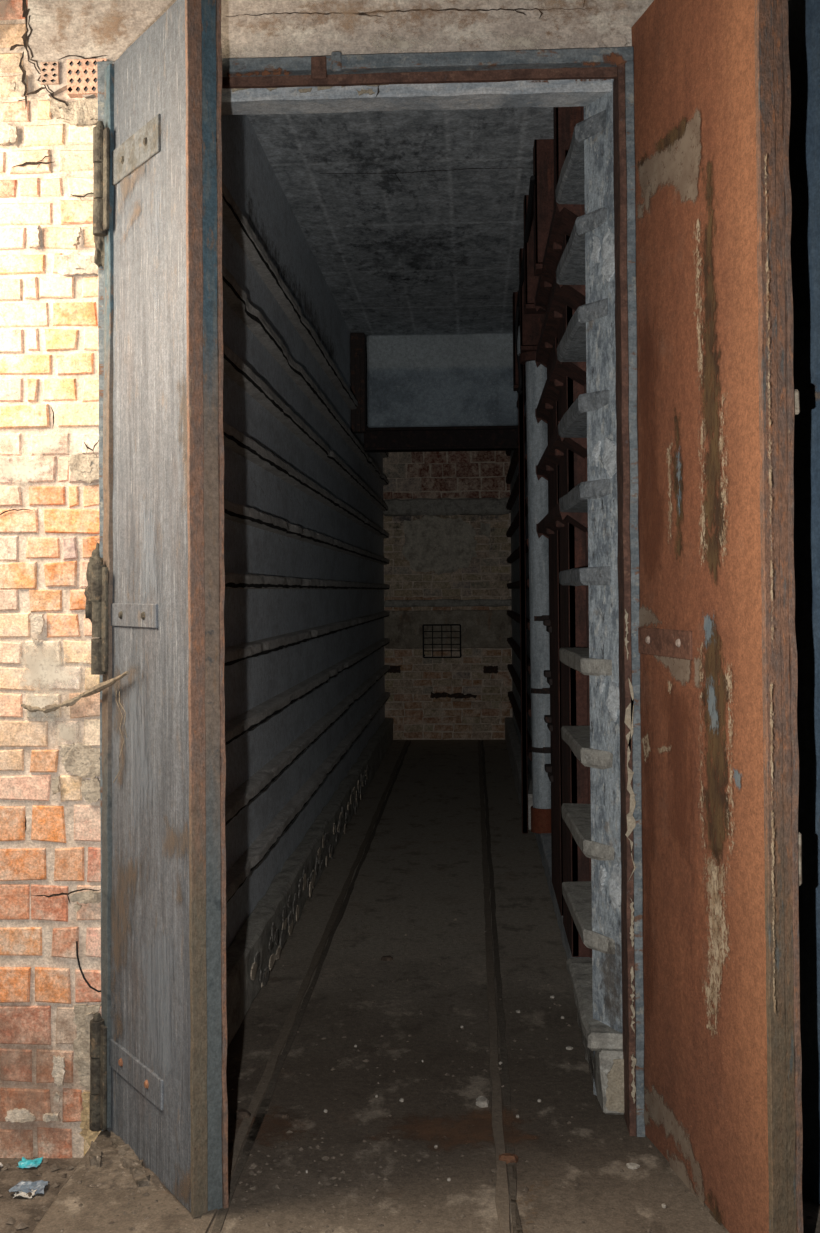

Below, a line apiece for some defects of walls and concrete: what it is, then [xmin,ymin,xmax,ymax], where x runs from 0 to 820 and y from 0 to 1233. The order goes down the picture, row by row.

crack [10,0,106,108]
peeling [51,742,100,804]